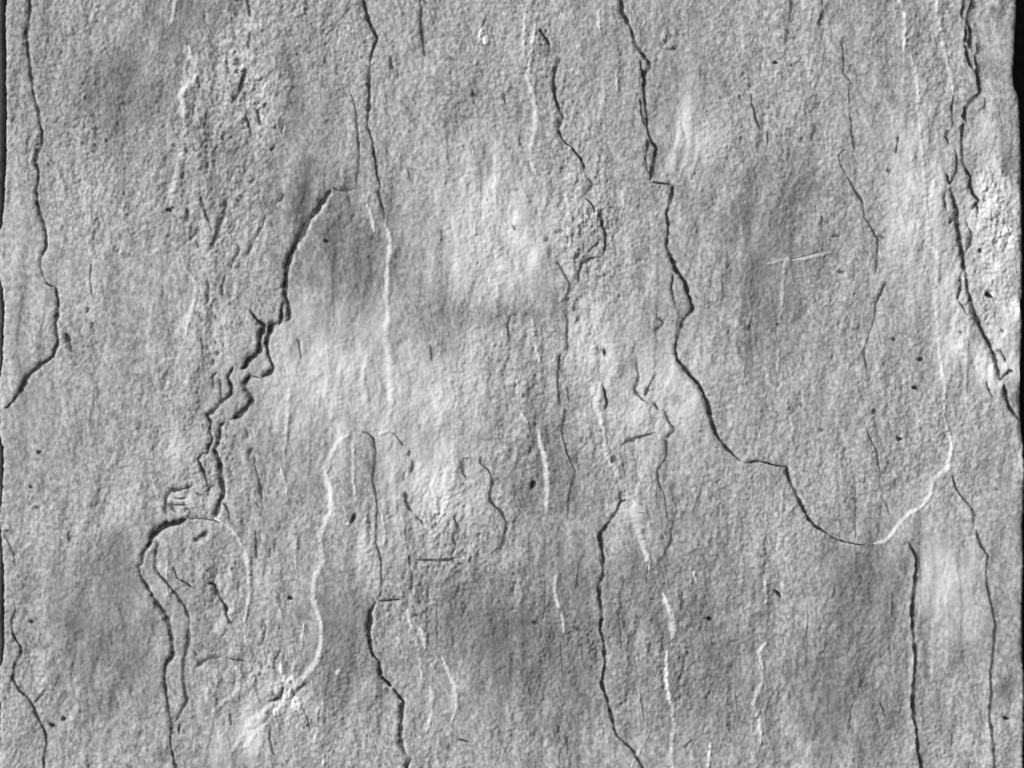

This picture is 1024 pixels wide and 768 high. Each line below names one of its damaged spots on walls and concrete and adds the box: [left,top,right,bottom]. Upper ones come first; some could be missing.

crack [417,0,425,55]
crack [4,0,94,409]
crack [137,0,393,768]
crack [364,432,507,768]
crack [540,29,606,511]
crack [575,491,644,768]
crack [610,361,674,600]
crack [619,0,864,545]
crack [837,44,886,369]
crack [867,541,923,768]
crack [951,475,996,768]
crack [943,0,1019,420]